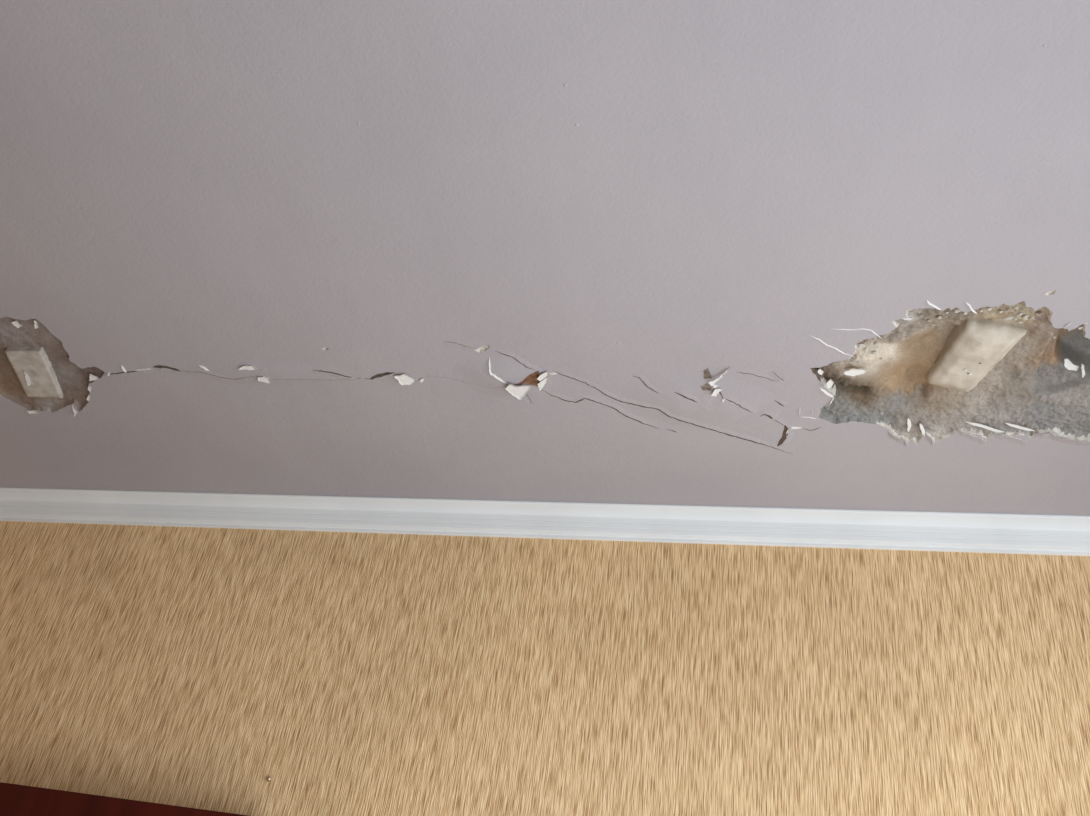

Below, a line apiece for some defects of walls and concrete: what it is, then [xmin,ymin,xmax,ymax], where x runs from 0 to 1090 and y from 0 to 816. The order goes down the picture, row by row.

spalling [0,317,110,416]
crack [105,365,371,382]
peeling [505,371,557,403]
crack [424,341,822,455]
peeling [700,367,730,402]
spalling [799,290,1090,447]